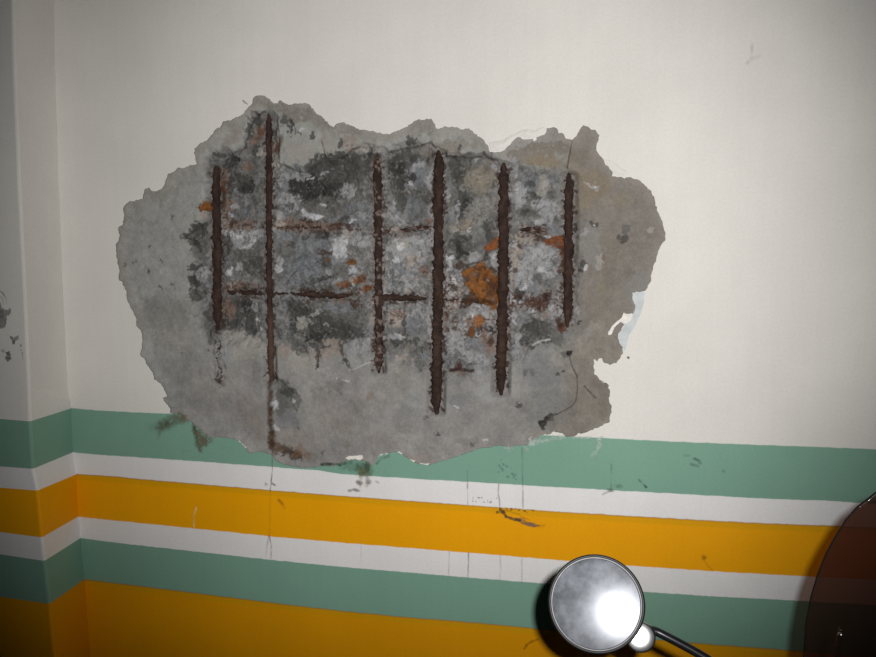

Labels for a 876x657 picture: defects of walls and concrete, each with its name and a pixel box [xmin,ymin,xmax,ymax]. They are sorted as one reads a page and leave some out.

rust [544,236,565,266]
rust [337,275,372,292]
spalling [117,96,666,468]
rust [462,262,499,310]
rust [514,293,549,309]
rust [268,376,301,457]
crack [538,386,590,427]